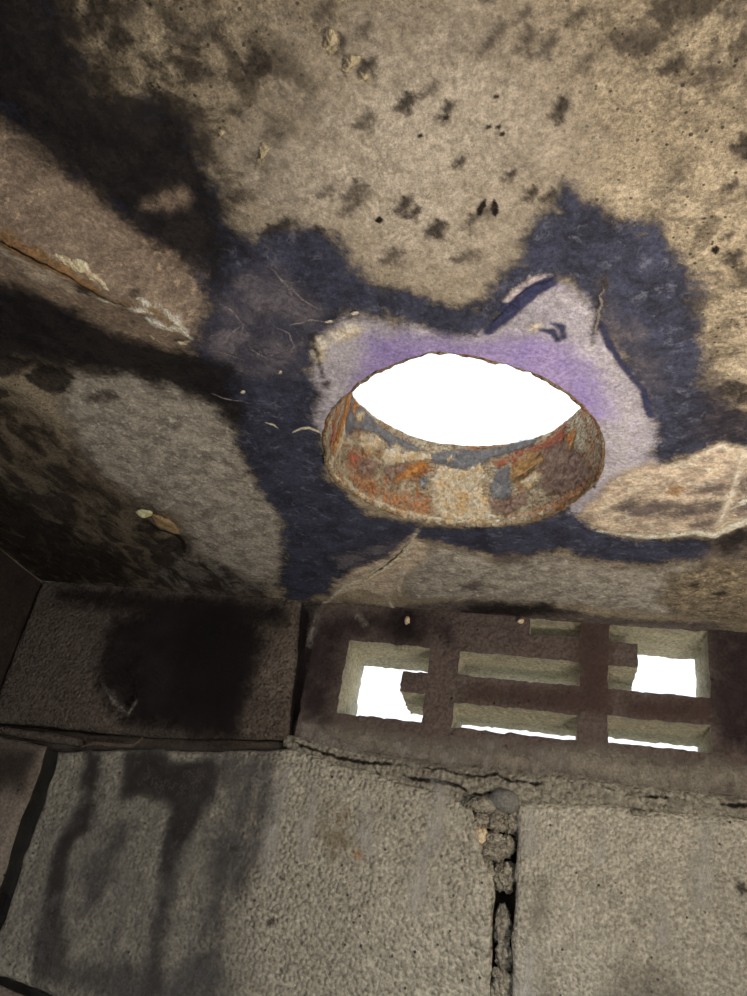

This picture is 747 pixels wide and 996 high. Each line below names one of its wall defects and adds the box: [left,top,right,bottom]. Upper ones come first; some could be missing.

damp [115,3,287,114]
damp [227,0,571,280]
damp [712,247,747,289]
corrosion [330,392,359,453]
corrosion [347,449,436,515]
damp [310,283,747,561]
corrosion [488,422,595,517]
damp [0,354,285,741]
damp [402,548,697,615]
crack [295,742,541,796]
crack [721,802,747,810]
damp [32,751,279,996]